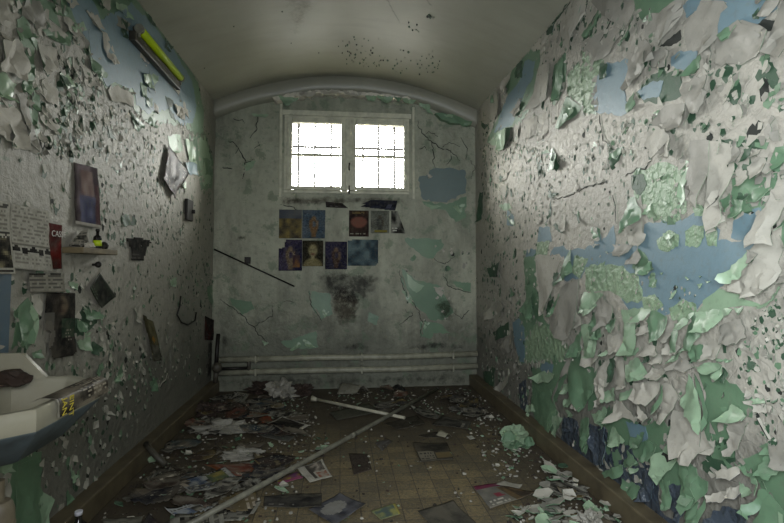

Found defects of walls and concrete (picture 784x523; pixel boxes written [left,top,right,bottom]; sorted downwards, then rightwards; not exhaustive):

peeling [0,0,273,523]
damp [327,275,371,318]
peeling [399,0,784,523]